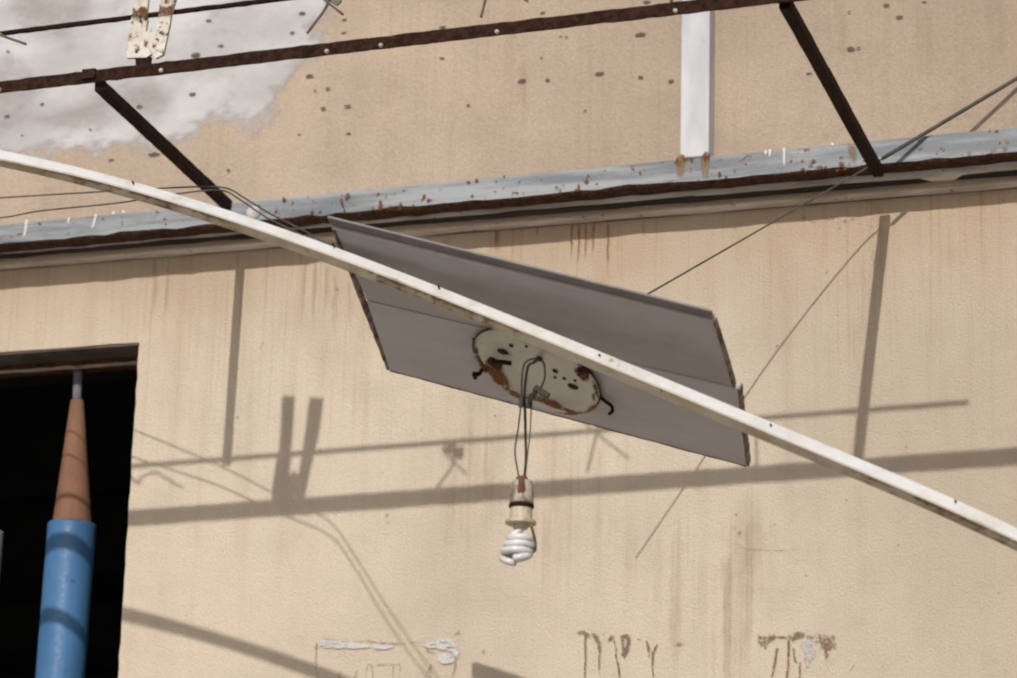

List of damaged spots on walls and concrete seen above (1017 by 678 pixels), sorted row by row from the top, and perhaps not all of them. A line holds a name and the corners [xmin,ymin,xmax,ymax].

peeling [0,0,329,159]
corrosion [0,0,806,93]
corrosion [45,170,223,221]
corrosion [674,152,735,179]
corrosion [367,270,519,332]
corrosion [472,338,598,415]